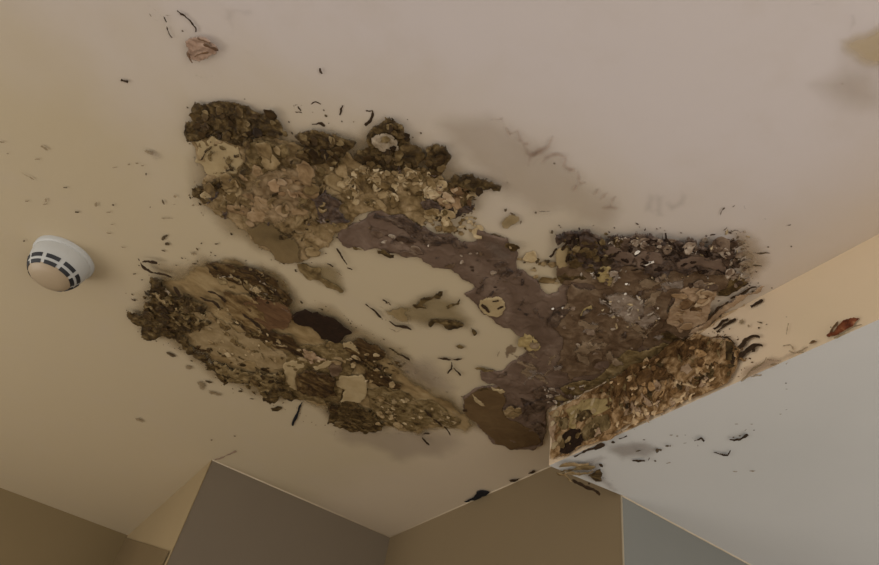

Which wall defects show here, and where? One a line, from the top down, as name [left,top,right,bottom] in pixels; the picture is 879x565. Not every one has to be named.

spalling [126,101,787,496]
rust [826,317,861,339]